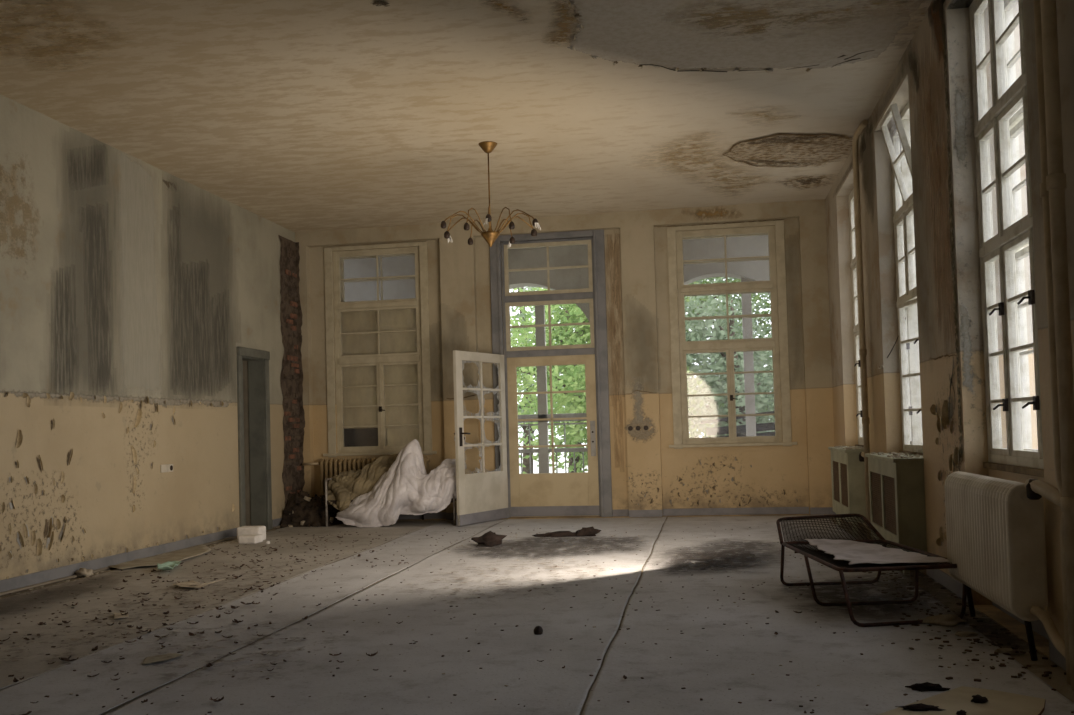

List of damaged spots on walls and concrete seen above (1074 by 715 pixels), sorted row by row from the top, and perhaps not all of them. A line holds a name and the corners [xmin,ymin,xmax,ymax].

peeling [567,0,923,73]
peeling [0,429,94,563]
peeling [2,391,232,512]